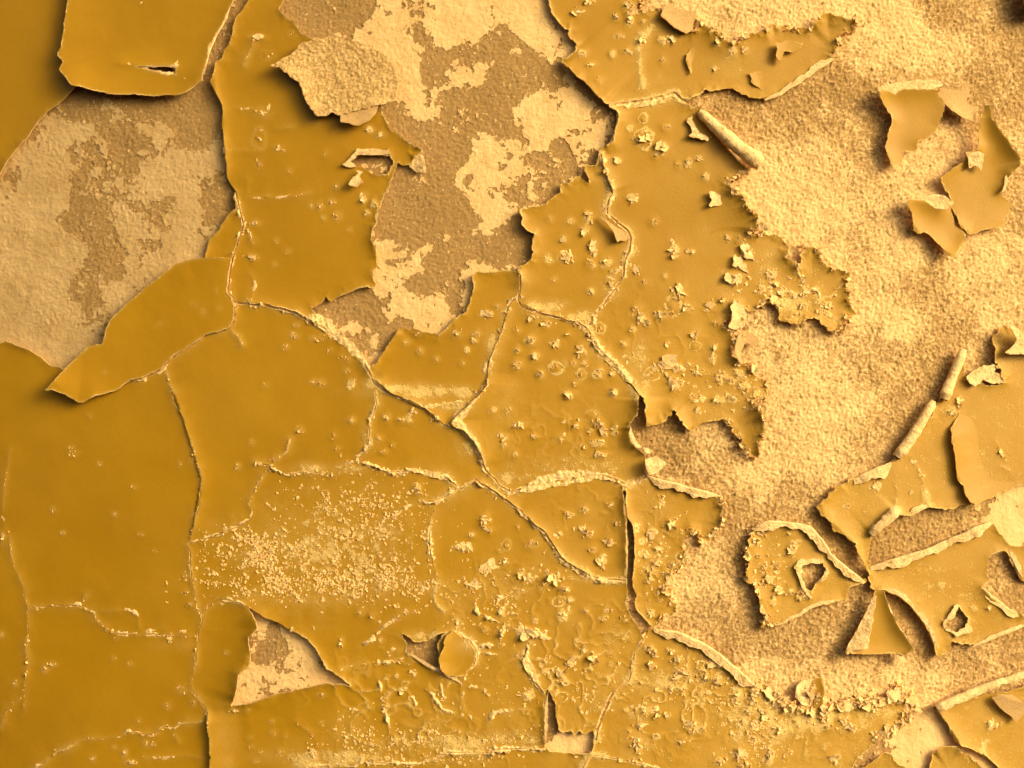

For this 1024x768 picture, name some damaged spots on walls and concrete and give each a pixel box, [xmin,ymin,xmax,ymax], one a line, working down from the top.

peeling [0,0,248,403]
crack [1,155,647,768]
peeling [271,0,618,367]
peeling [623,0,1024,768]
peeling [231,609,349,705]
peeling [402,630,475,684]
crack [582,627,659,768]